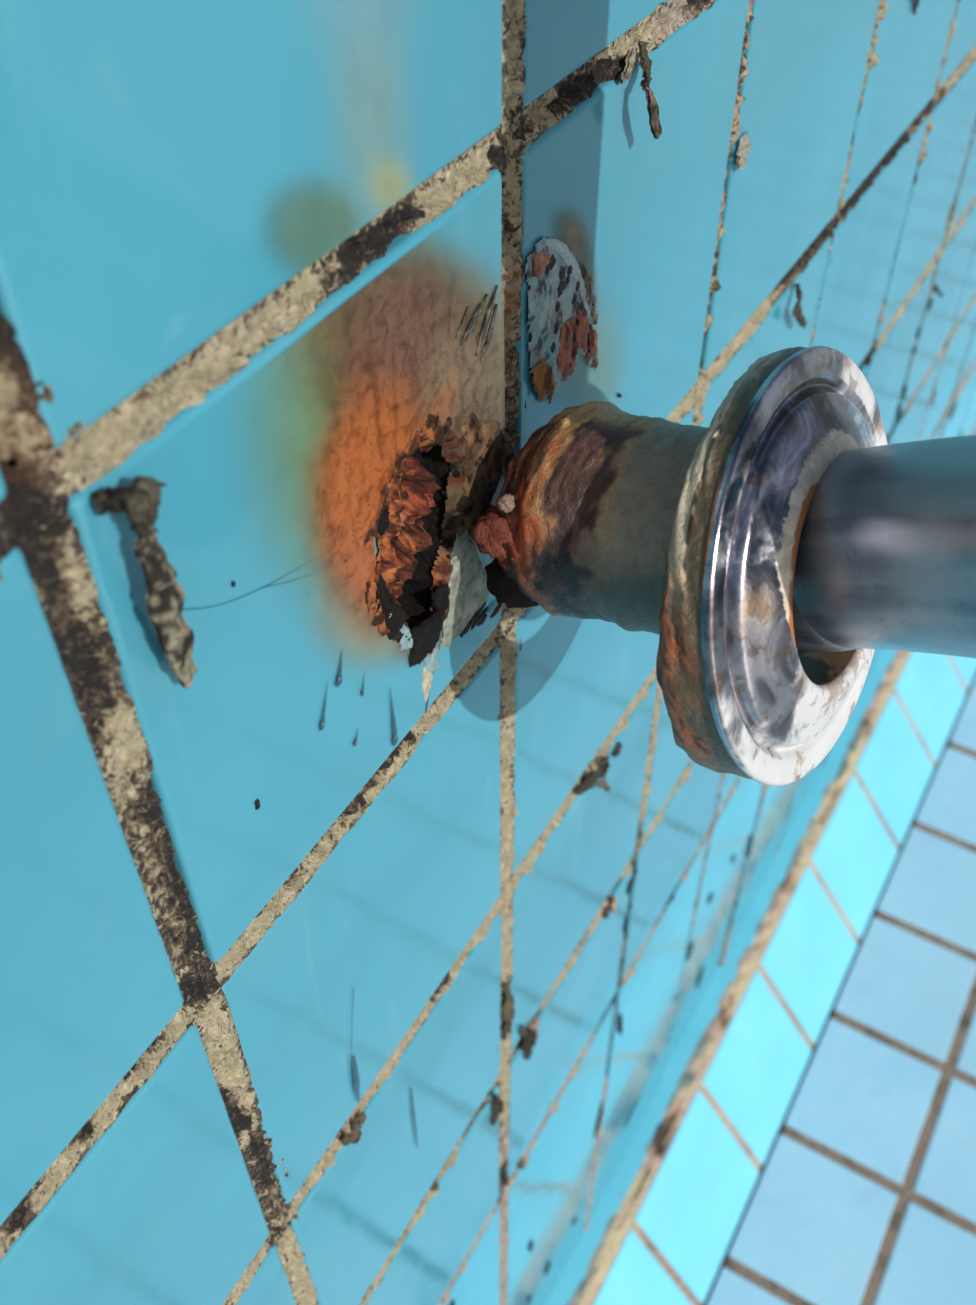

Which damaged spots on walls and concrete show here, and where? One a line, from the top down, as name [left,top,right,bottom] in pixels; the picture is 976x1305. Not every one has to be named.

spalling [524,236,598,404]
peeling [92,476,197,688]
rust [292,251,507,649]
spalling [376,437,503,673]